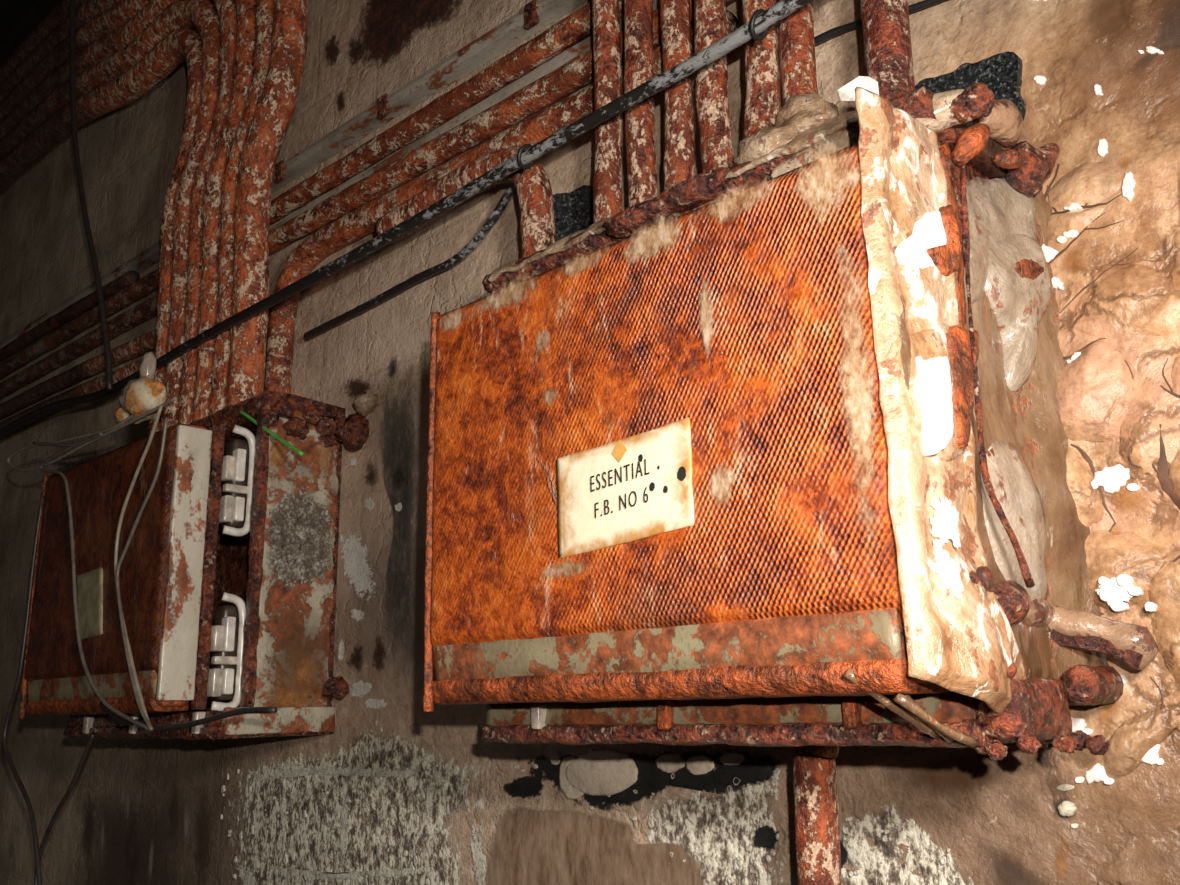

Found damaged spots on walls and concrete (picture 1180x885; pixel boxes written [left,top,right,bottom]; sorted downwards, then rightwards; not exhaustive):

leakage [325,0,461,66]
leakage [1143,21,1180,61]
leakage [504,748,595,798]
leakage [574,747,780,810]
leakage [753,825,779,849]
leakage [840,840,848,868]